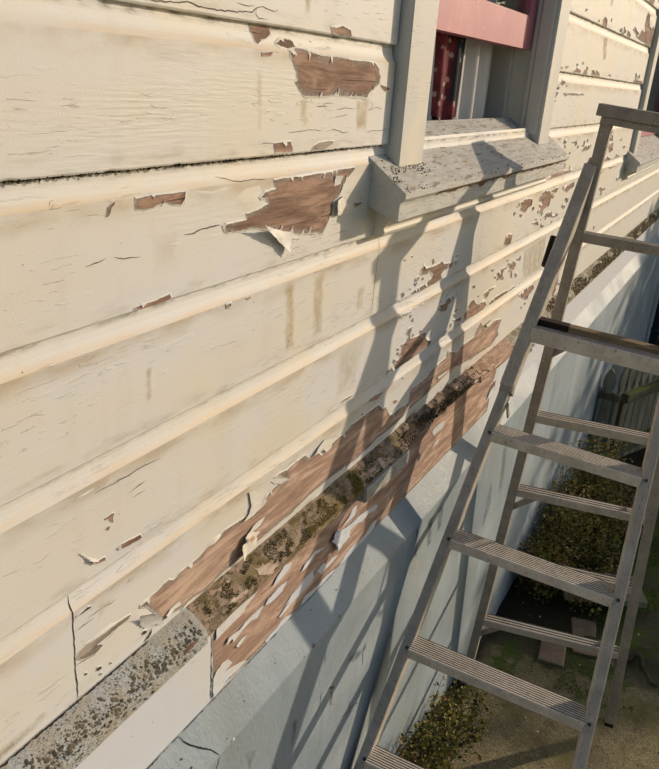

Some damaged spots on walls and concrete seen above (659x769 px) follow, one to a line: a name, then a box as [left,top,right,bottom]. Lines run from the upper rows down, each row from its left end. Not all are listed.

peeling [248,23,390,101]
peeling [620,0,659,47]
peeling [134,190,187,212]
peeling [221,166,364,255]
peeling [75,254,534,698]
crack [0,598,149,768]
crack [147,638,231,769]